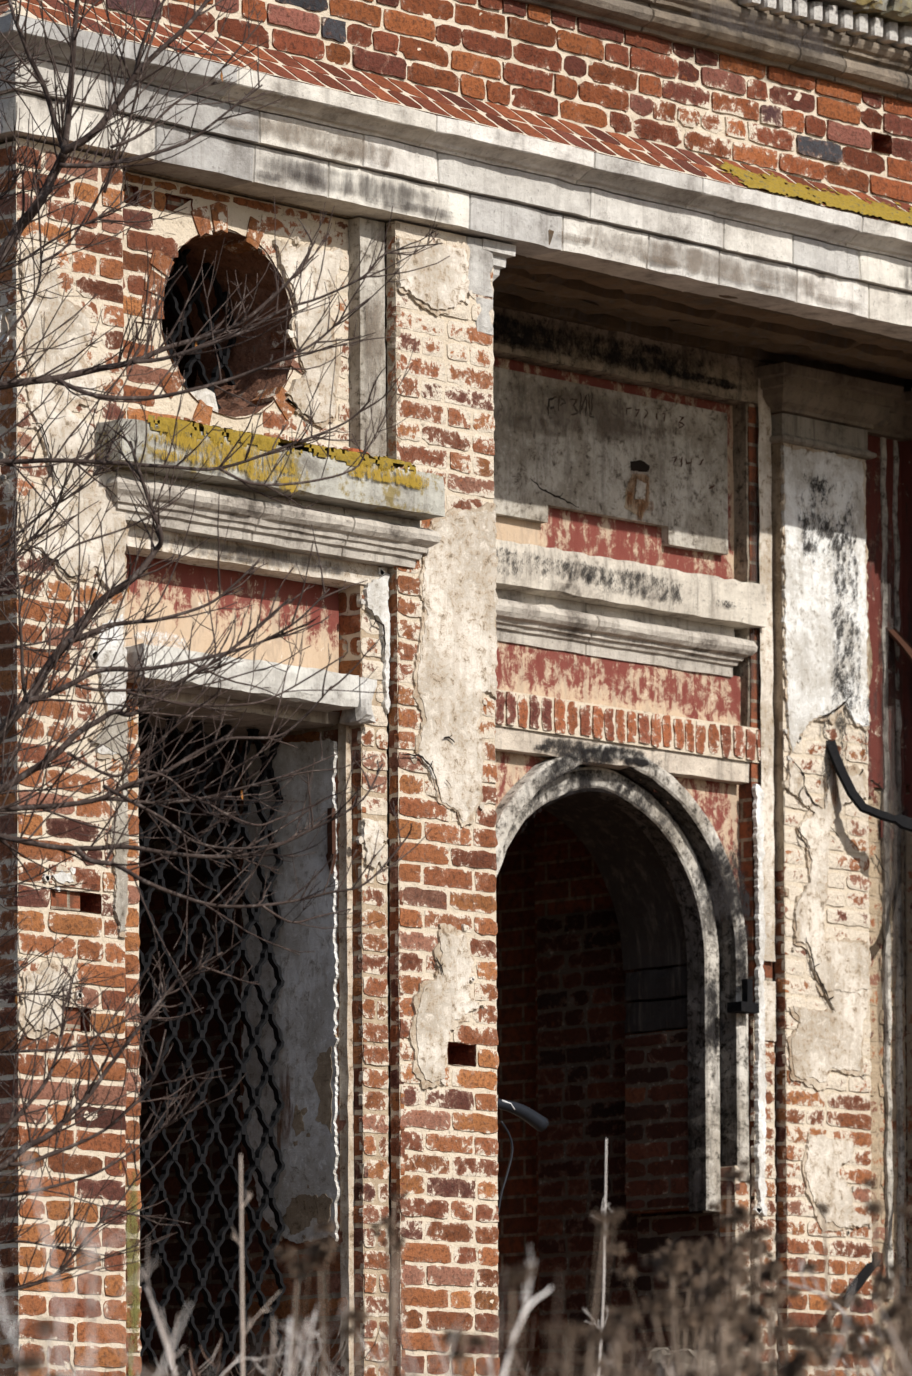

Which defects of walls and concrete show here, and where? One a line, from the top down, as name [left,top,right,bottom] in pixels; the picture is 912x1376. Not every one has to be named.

spalling [165,193,193,214]
flaking render [272,236,343,428]
flaking render [395,237,473,317]
leakage [247,468,301,493]
flaking render [410,502,499,827]
crack [791,758,839,852]
flaking render [779,442,873,1091]
leakage [799,471,912,1029]
flaking render [408,923,486,1089]
flaking render [752,784,768,1217]
crack [806,937,835,1010]
flaking render [801,1133,873,1235]